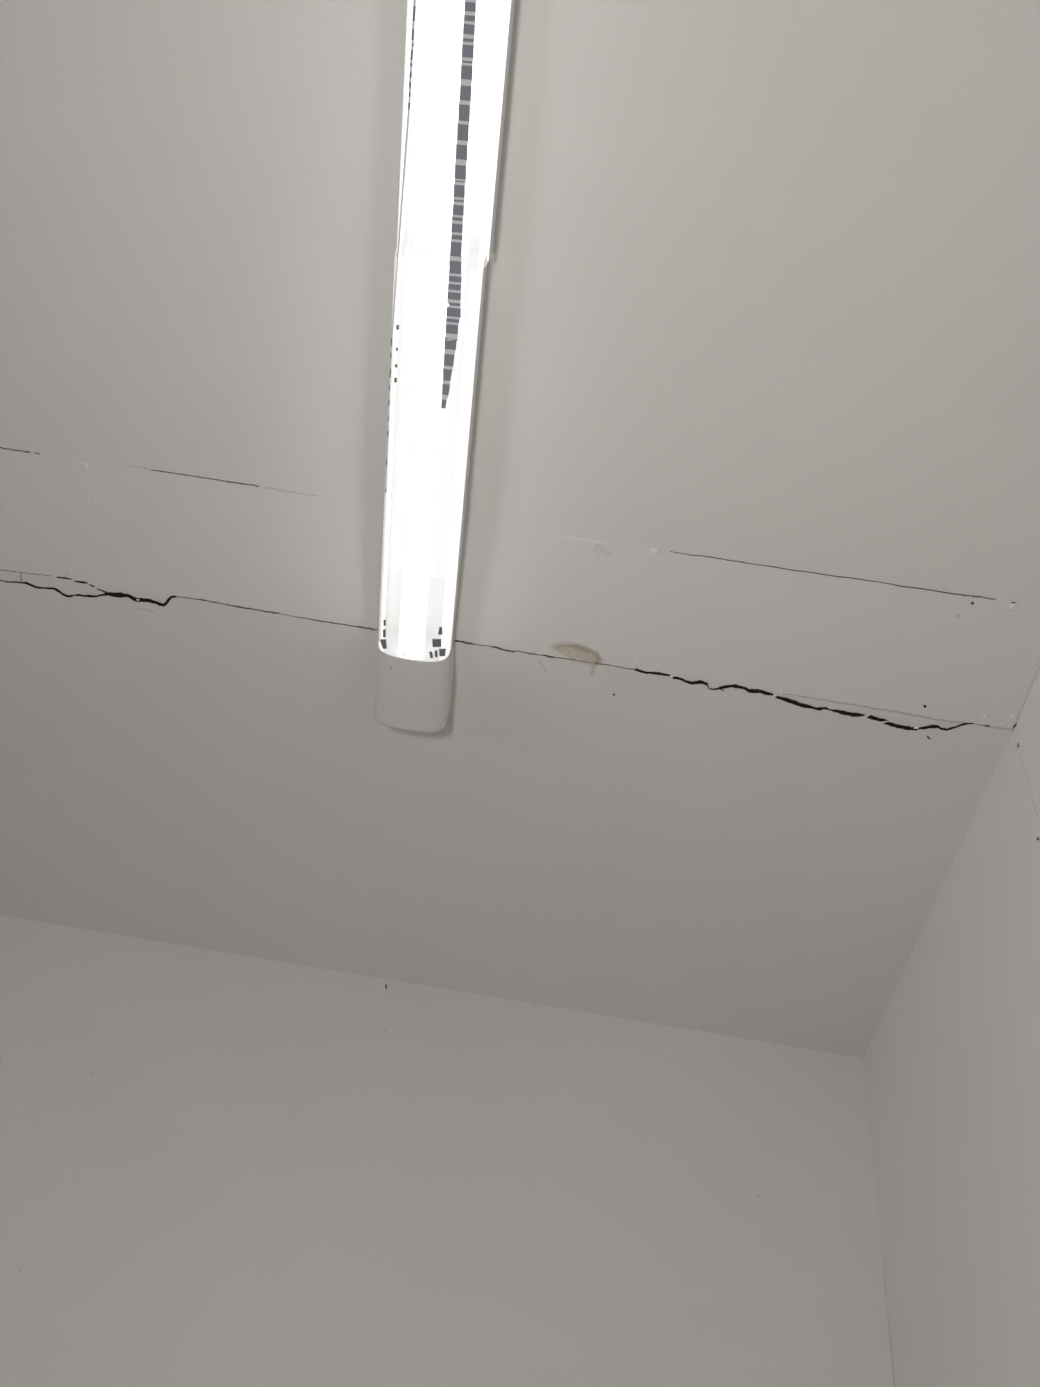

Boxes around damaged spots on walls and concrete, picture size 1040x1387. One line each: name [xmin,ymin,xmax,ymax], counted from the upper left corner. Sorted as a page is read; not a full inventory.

crack [0,570,378,630]
crack [455,640,1040,821]